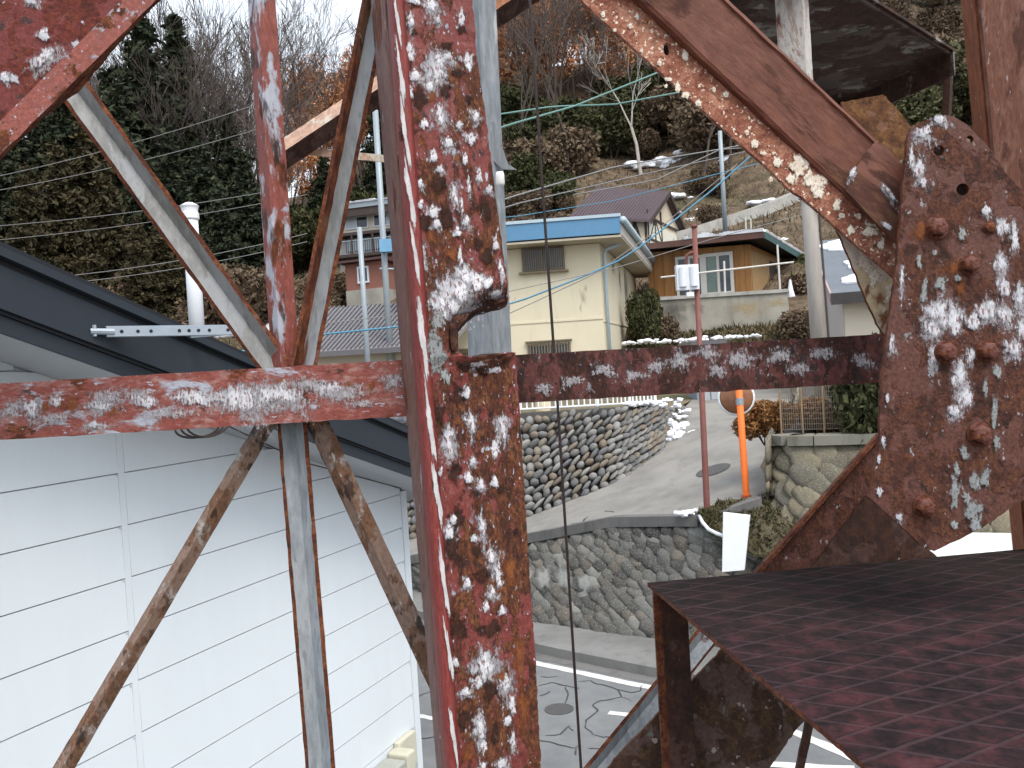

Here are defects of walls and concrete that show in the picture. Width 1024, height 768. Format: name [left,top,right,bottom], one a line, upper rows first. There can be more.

corrosion [441,26,467,49]
corrosion [412,69,468,110]
peeling [908,114,954,188]
corrosion [419,209,454,242]
peeling [917,202,1024,451]
peeling [0,372,403,435]
corrosion [436,382,465,424]
peeling [394,0,518,768]
corrosion [448,462,462,485]
corrosion [445,506,465,566]
corrosion [450,611,501,641]
corrosion [483,638,530,729]